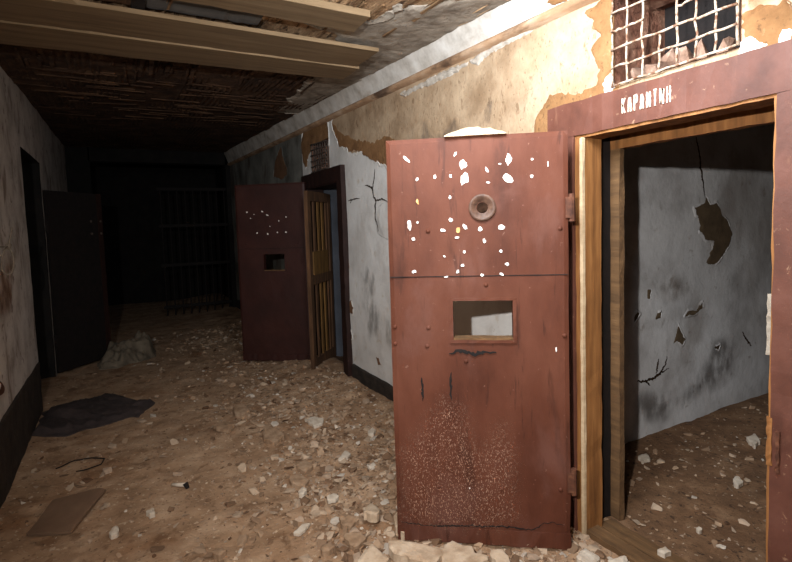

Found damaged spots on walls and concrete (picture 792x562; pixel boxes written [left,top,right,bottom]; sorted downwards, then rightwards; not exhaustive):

peeling [276,0,792,169]
peeling [449,152,468,185]
peeling [499,153,513,183]
crack [348,170,387,228]
peeling [693,196,732,265]